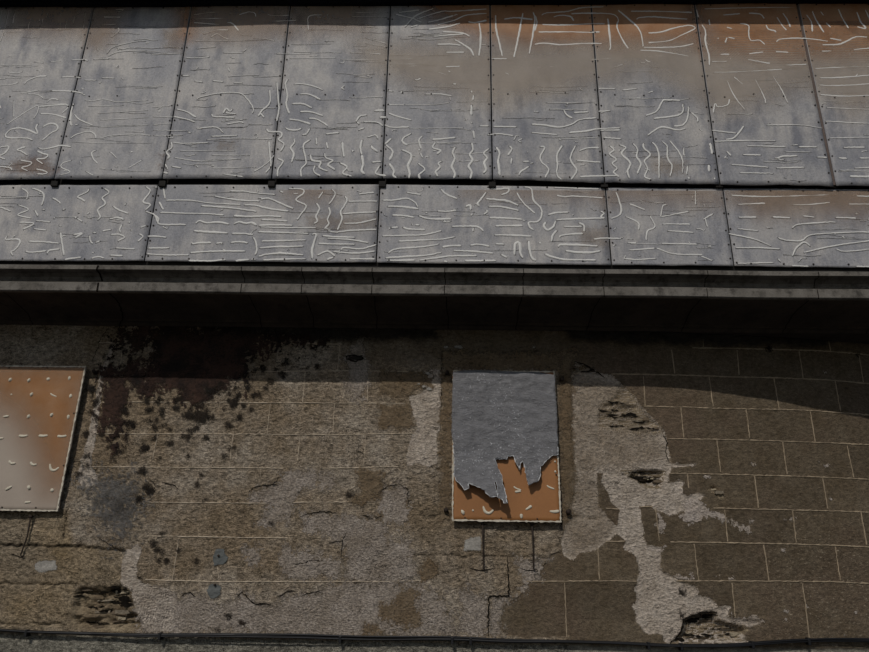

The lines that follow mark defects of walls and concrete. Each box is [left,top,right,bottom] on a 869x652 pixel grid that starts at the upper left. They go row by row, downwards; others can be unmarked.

damp [0,325,436,480]
damp [134,465,155,502]
damp [346,467,386,506]
flaking render [70,337,765,644]
crack [237,590,323,605]
crack [487,557,510,636]